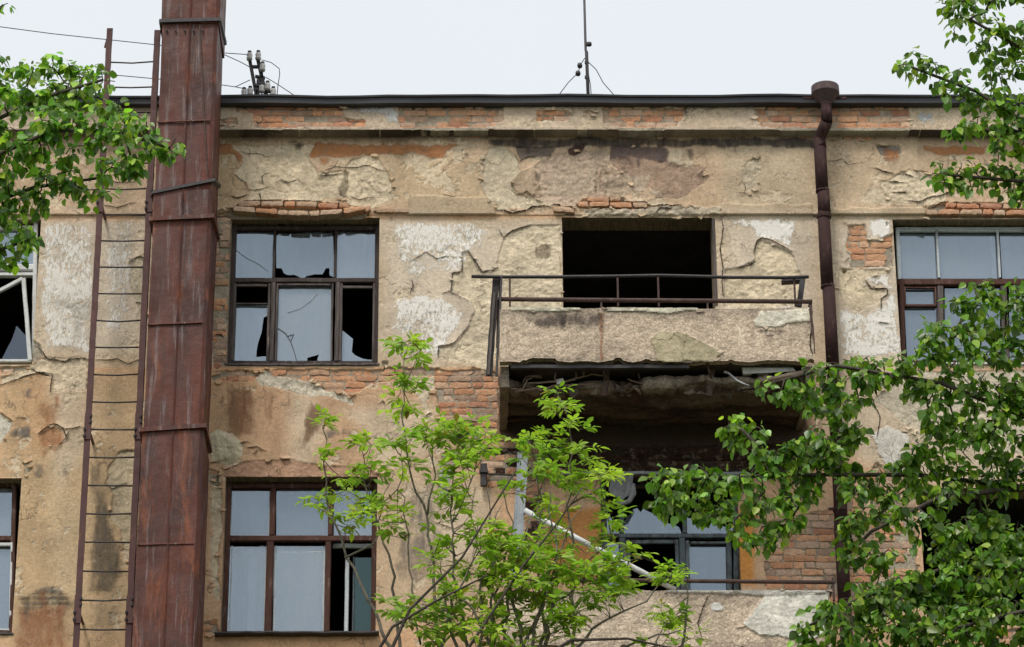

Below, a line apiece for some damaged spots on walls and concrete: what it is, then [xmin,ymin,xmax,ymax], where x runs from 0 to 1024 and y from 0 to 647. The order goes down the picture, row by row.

crack [217,152,384,244]
crack [830,159,1003,208]
flaking render [211,106,815,554]
peeling [835,219,901,357]
flaking render [0,414,12,443]
leakage [92,491,120,591]